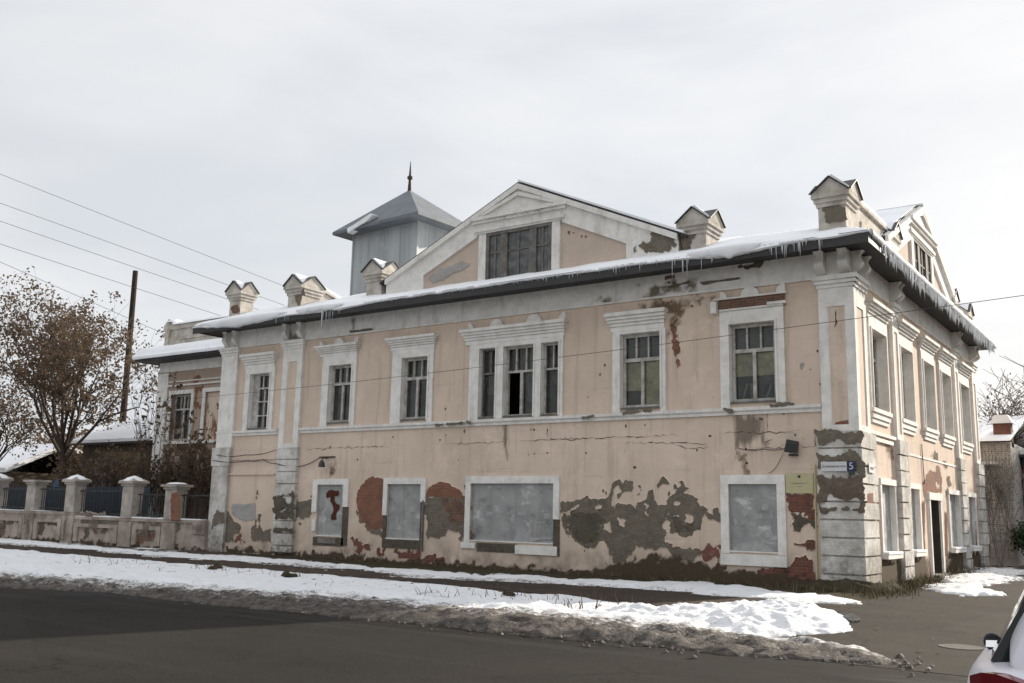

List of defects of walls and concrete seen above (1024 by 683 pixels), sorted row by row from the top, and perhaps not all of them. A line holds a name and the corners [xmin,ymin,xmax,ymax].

flaking render [822,205,848,223]
flaking render [633,232,696,253]
flaking render [670,318,682,369]
crack [445,414,816,450]
water stain [735,416,763,475]
flaking render [73,510,119,543]
flaking render [137,439,312,550]
flaking render [312,475,517,564]
flaking render [553,466,721,565]
flaking render [757,420,874,581]
flaking render [922,449,952,498]